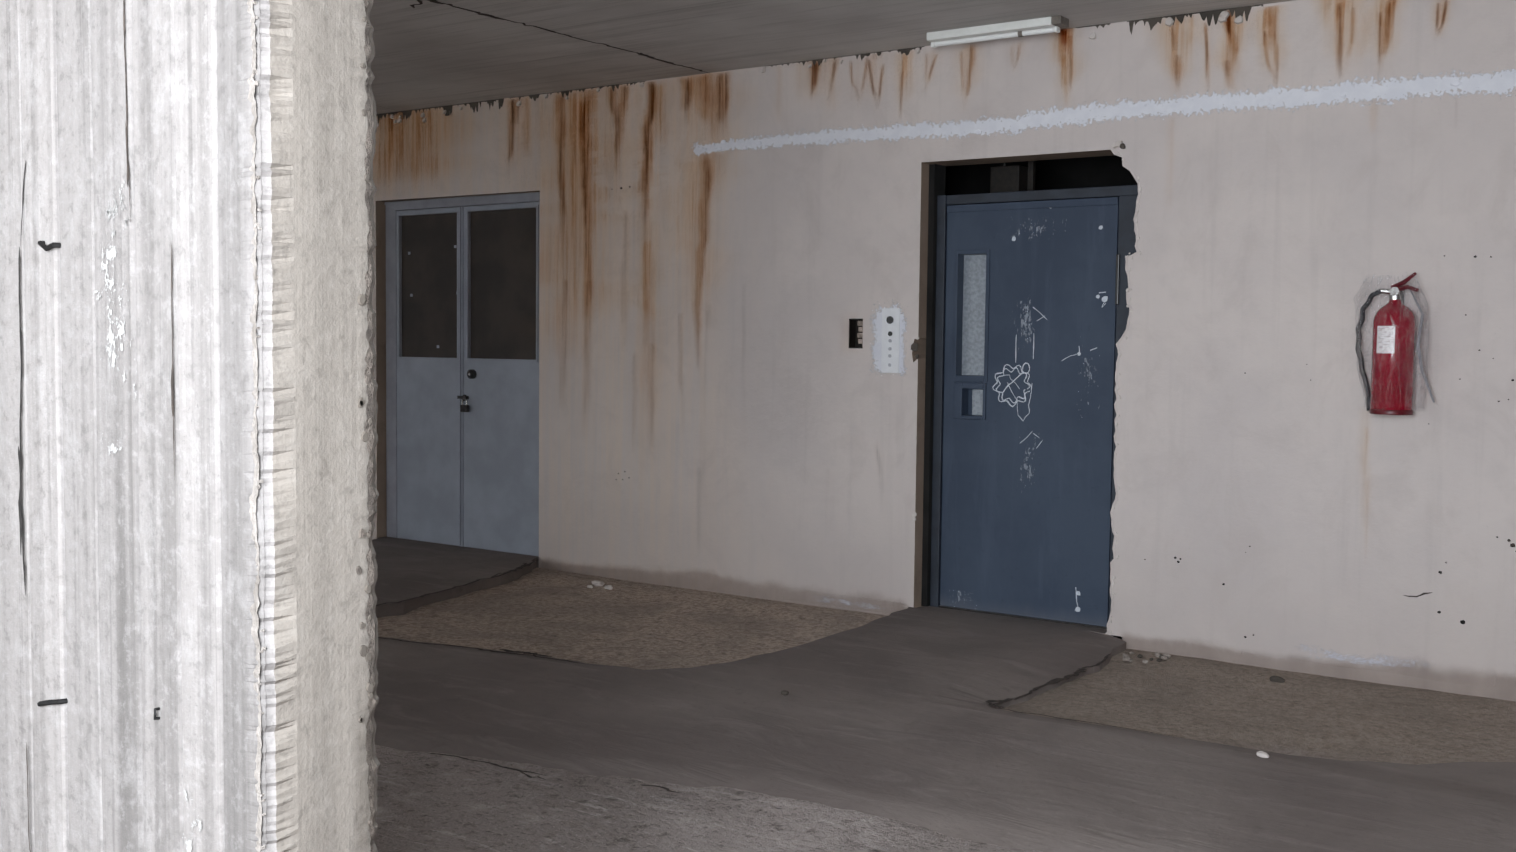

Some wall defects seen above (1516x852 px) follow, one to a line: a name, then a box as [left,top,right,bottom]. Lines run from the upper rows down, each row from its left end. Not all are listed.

rust [645,85,654,173]
spalling [1106,141,1142,634]